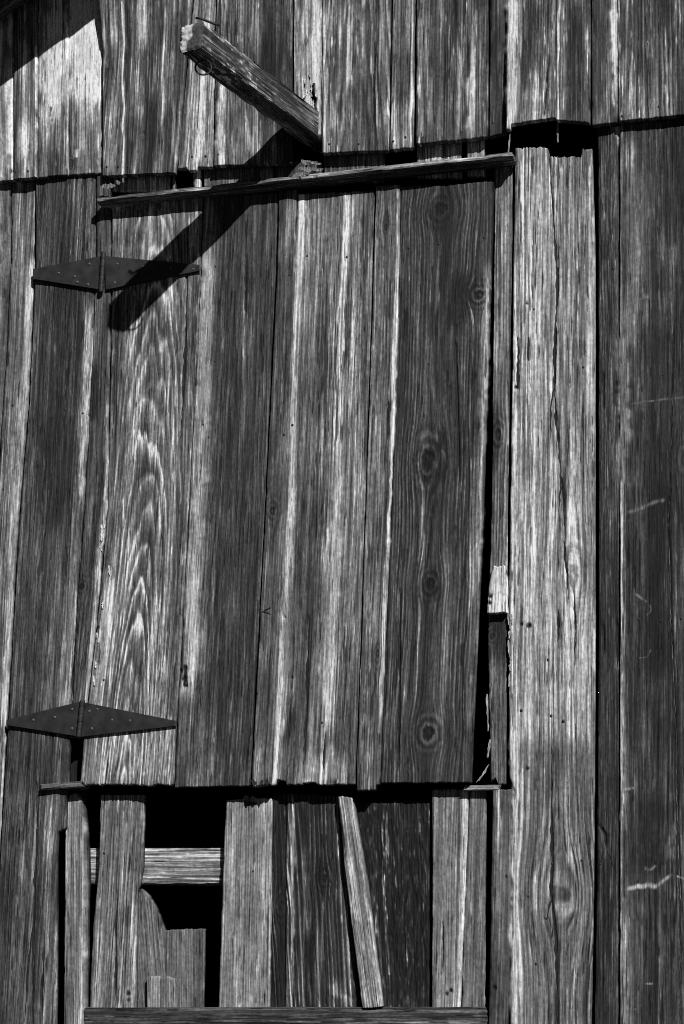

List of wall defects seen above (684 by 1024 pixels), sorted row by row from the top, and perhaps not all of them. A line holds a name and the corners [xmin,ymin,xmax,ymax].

crack [516,157,576,665]